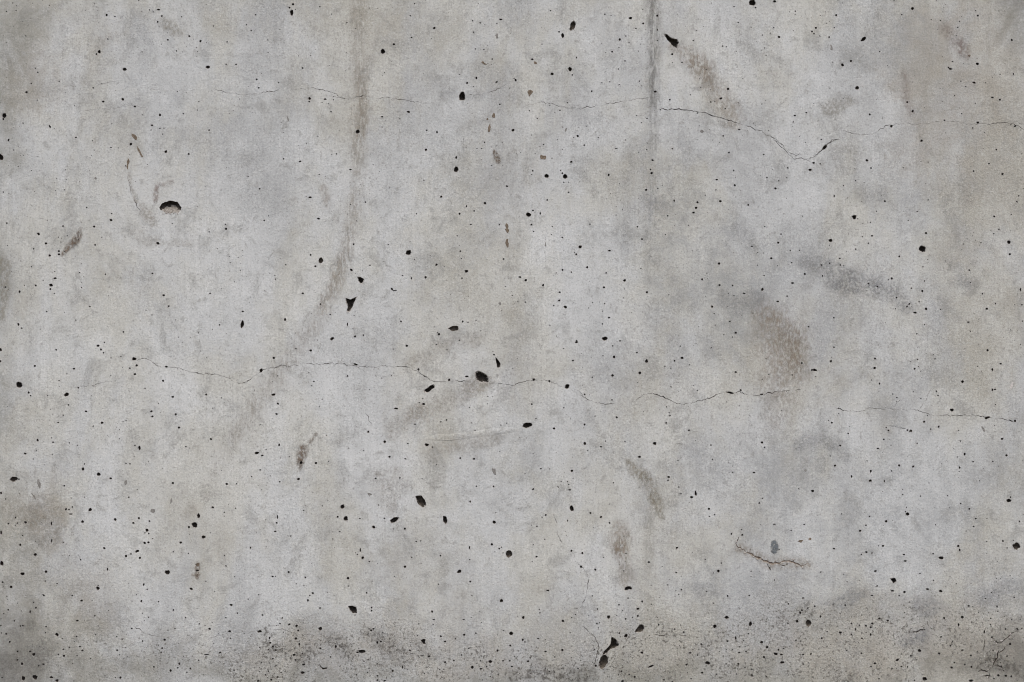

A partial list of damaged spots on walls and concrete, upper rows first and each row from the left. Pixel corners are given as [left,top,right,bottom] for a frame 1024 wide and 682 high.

crack [735,537,808,570]